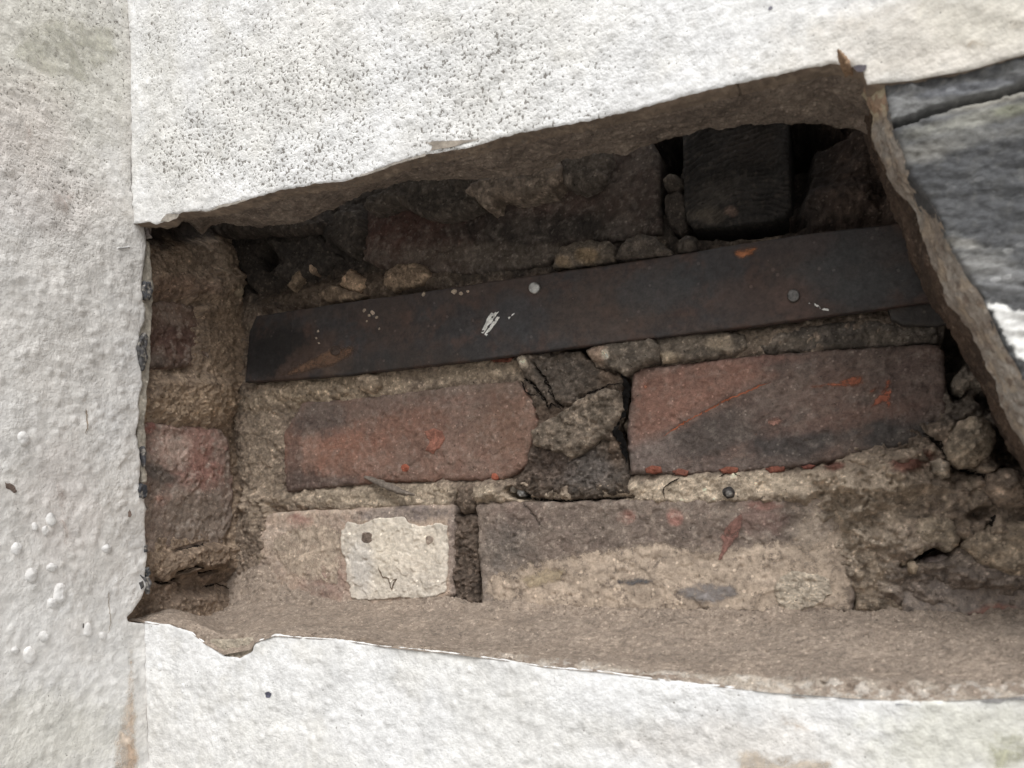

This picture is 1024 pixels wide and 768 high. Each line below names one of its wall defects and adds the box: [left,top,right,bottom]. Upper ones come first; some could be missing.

spalling [359,139,477,177]
spalling [861,87,1024,444]
peeling [136,214,179,499]
spalling [645,465,689,476]
peeling [340,517,449,600]
peeling [139,567,152,594]
spalling [210,637,255,658]